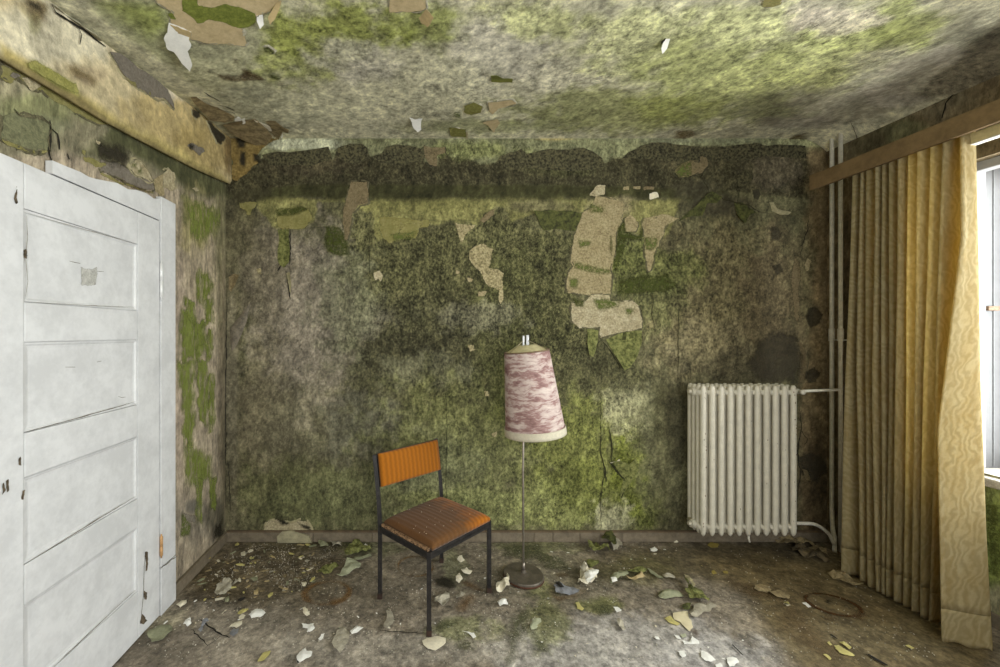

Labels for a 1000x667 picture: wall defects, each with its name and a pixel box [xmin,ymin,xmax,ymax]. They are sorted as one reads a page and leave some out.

peeling [155,0,281,71]
flaking render [108,51,175,111]
damp [219,70,280,81]
flaking render [191,97,289,181]
flaking render [342,180,371,241]
flaking render [455,209,504,304]
flaking render [534,185,679,371]
damp [806,307,823,327]
damp [749,332,820,383]
damp [799,453,827,481]